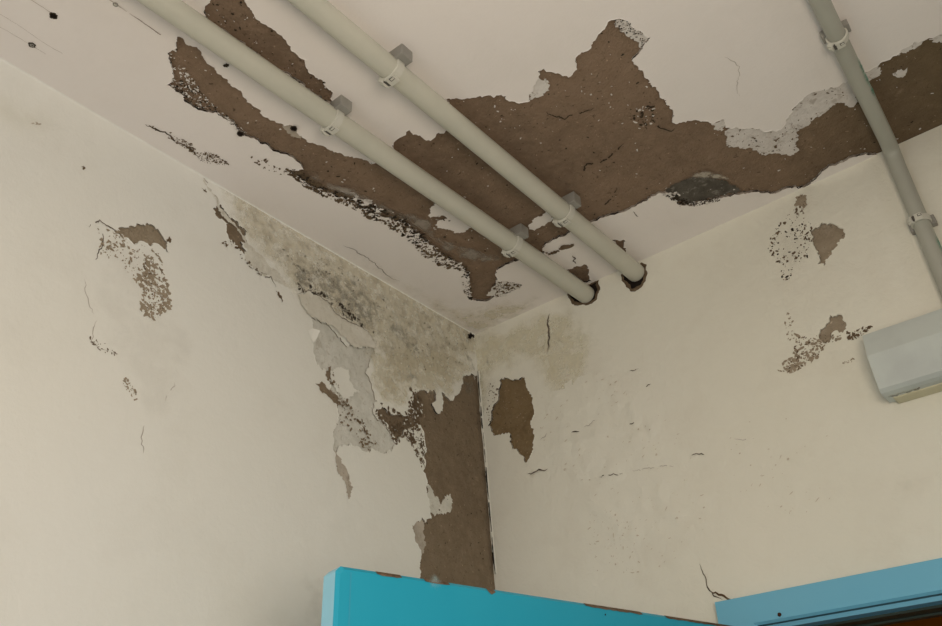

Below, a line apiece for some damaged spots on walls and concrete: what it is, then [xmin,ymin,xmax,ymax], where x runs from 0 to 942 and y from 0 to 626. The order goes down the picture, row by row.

peeling [203,0,334,103]
peeling [865,33,942,144]
peeling [89,220,172,321]
peeling [166,36,522,302]
damp [239,205,474,388]
peeling [391,129,600,306]
spalling [612,239,647,292]
peeling [445,18,882,280]
peeling [778,312,873,373]
peeling [308,317,535,594]
crack [700,566,729,600]